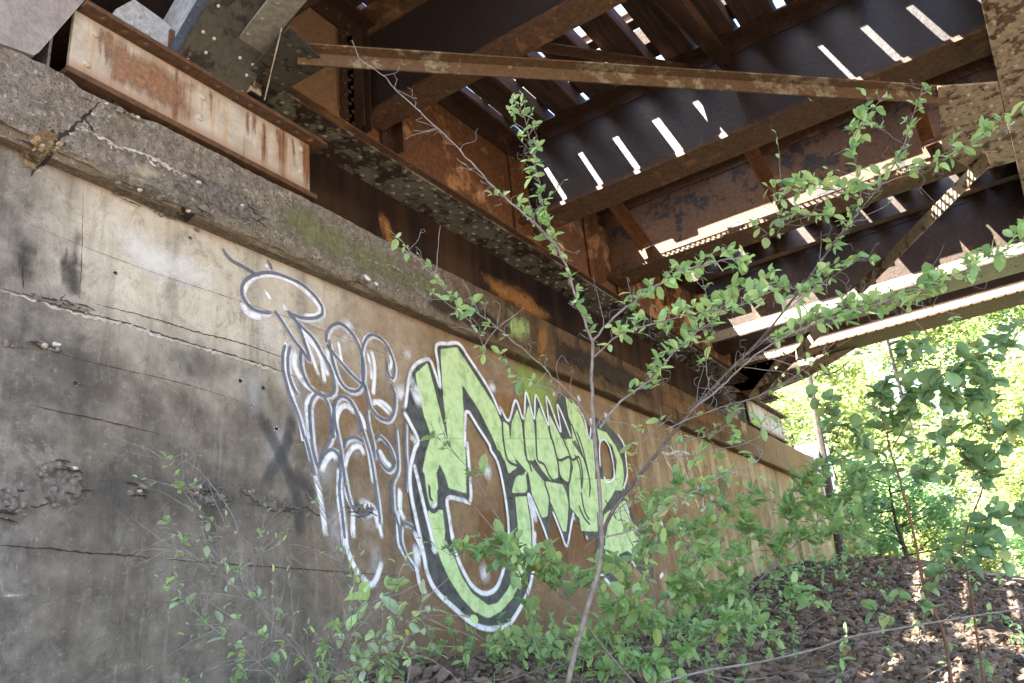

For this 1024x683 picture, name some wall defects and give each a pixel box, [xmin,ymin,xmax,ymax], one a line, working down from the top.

rust [99,29,192,117]
spalling [17,128,62,169]
crack [31,102,186,178]
rust [246,113,305,154]
rust [380,216,393,243]
crack [2,217,394,376]
leakage [287,210,529,337]
rust [490,281,544,317]
spalling [36,458,94,508]
crack [0,545,397,576]